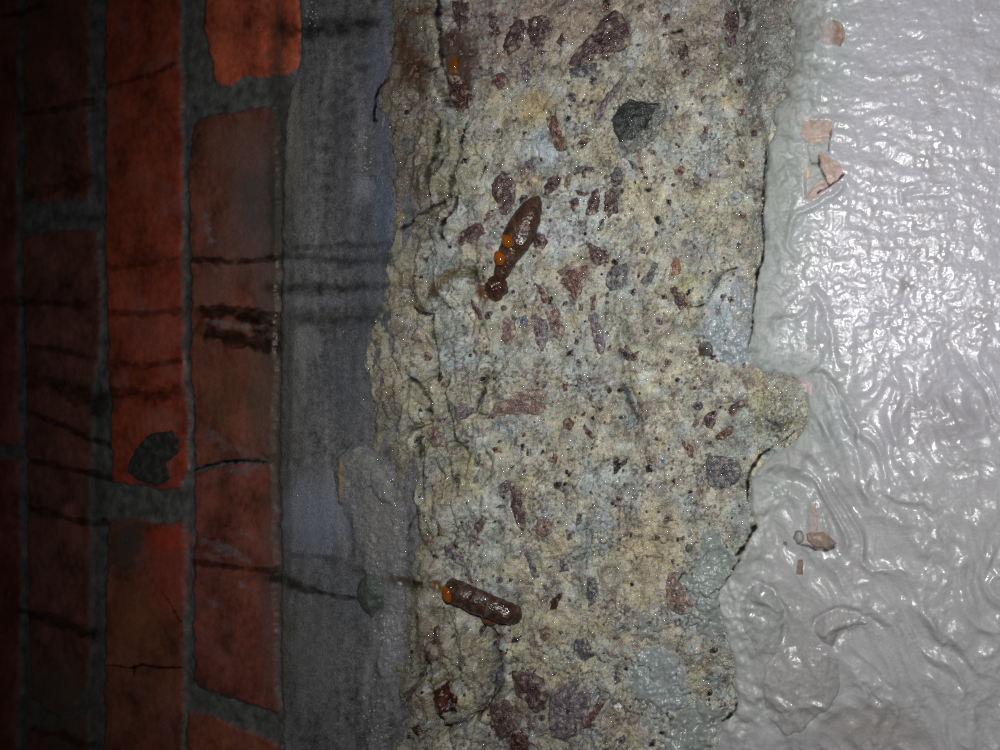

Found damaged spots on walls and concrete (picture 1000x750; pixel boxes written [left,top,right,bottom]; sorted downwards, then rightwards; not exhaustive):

spalling [364,0,814,750]
crack [195,459,266,471]
crack [746,431,795,498]